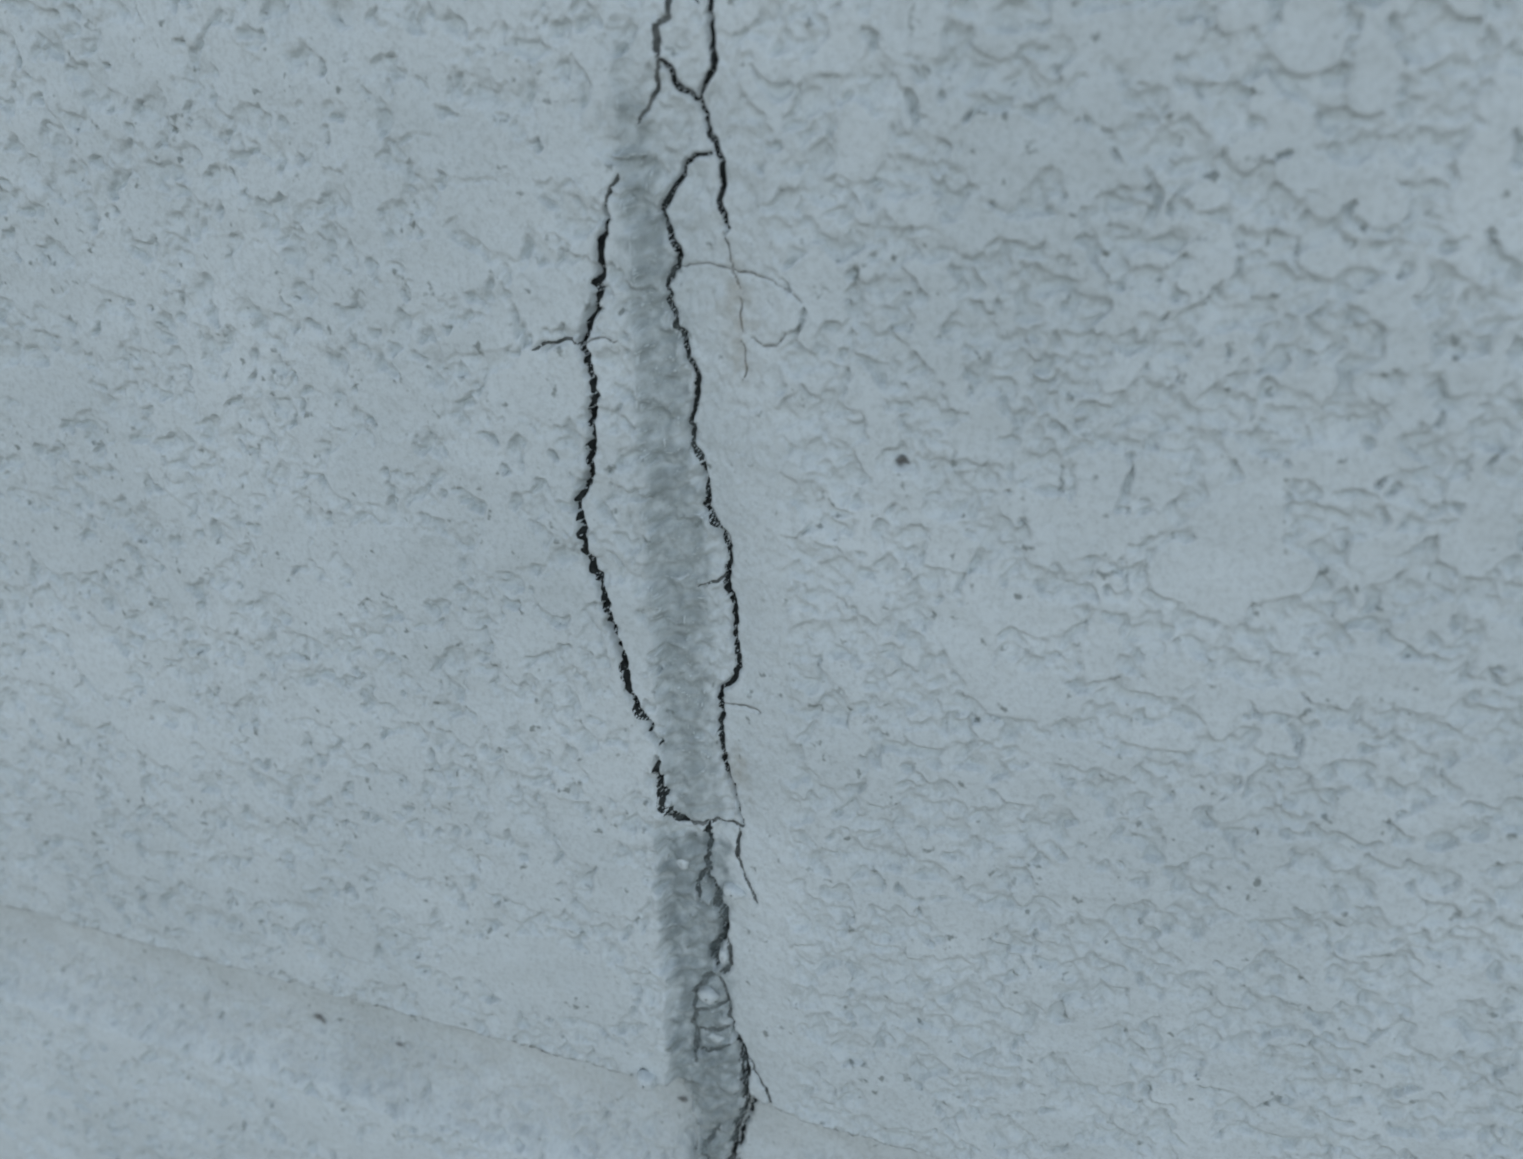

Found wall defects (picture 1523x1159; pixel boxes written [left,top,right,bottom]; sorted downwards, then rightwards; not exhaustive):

crack [531,0,802,1159]